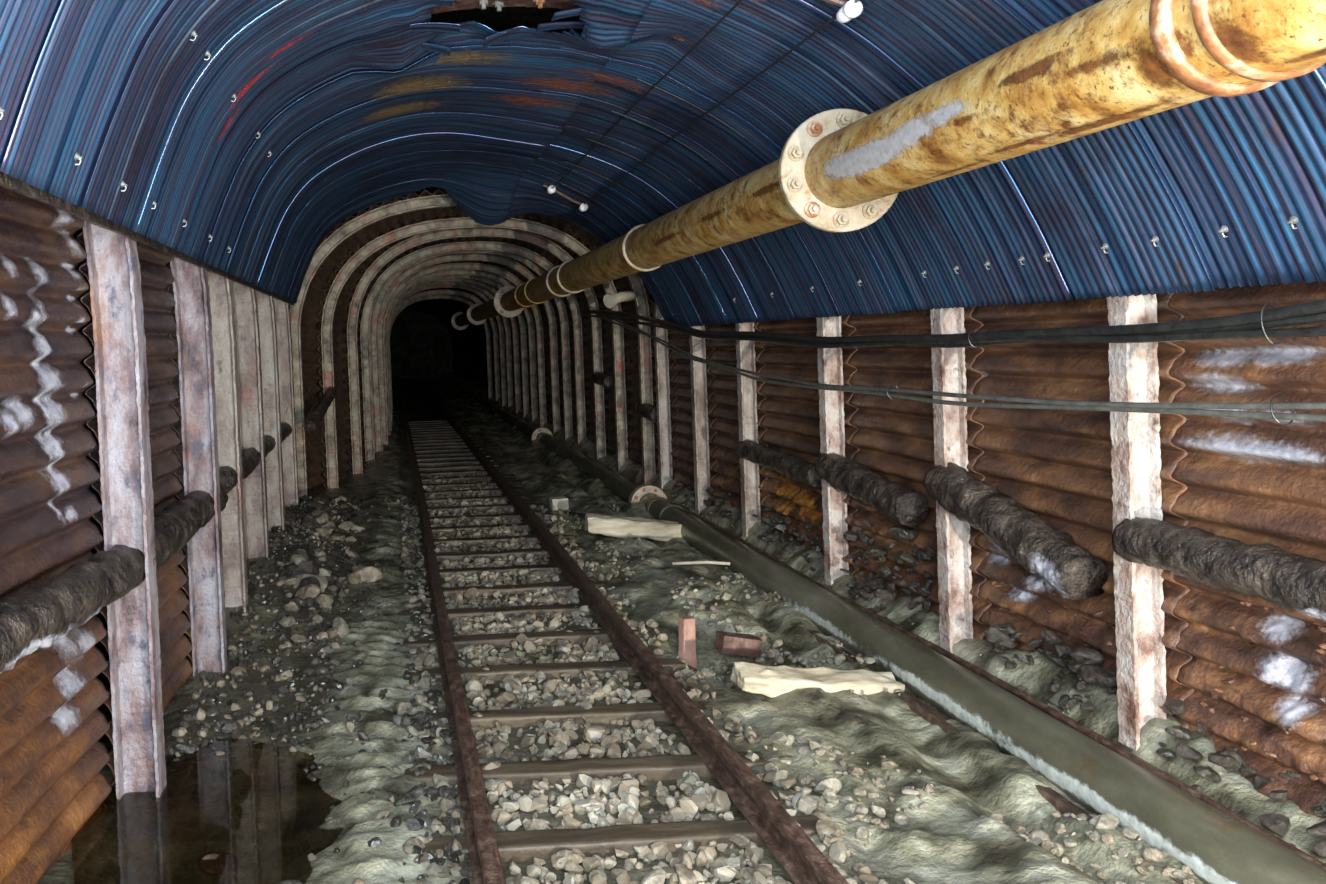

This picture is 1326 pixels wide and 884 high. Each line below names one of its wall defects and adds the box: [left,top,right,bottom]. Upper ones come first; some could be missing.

corrosion [1214,18,1267,63]
corrosion [1290,48,1326,63]
corrosion [933,42,1180,177]
efflorescence [31,262,47,281]
efflorescence [56,209,84,301]
efflorescence [3,307,86,519]
efflorescence [1264,612,1326,639]
efflorescence [1261,657,1308,724]